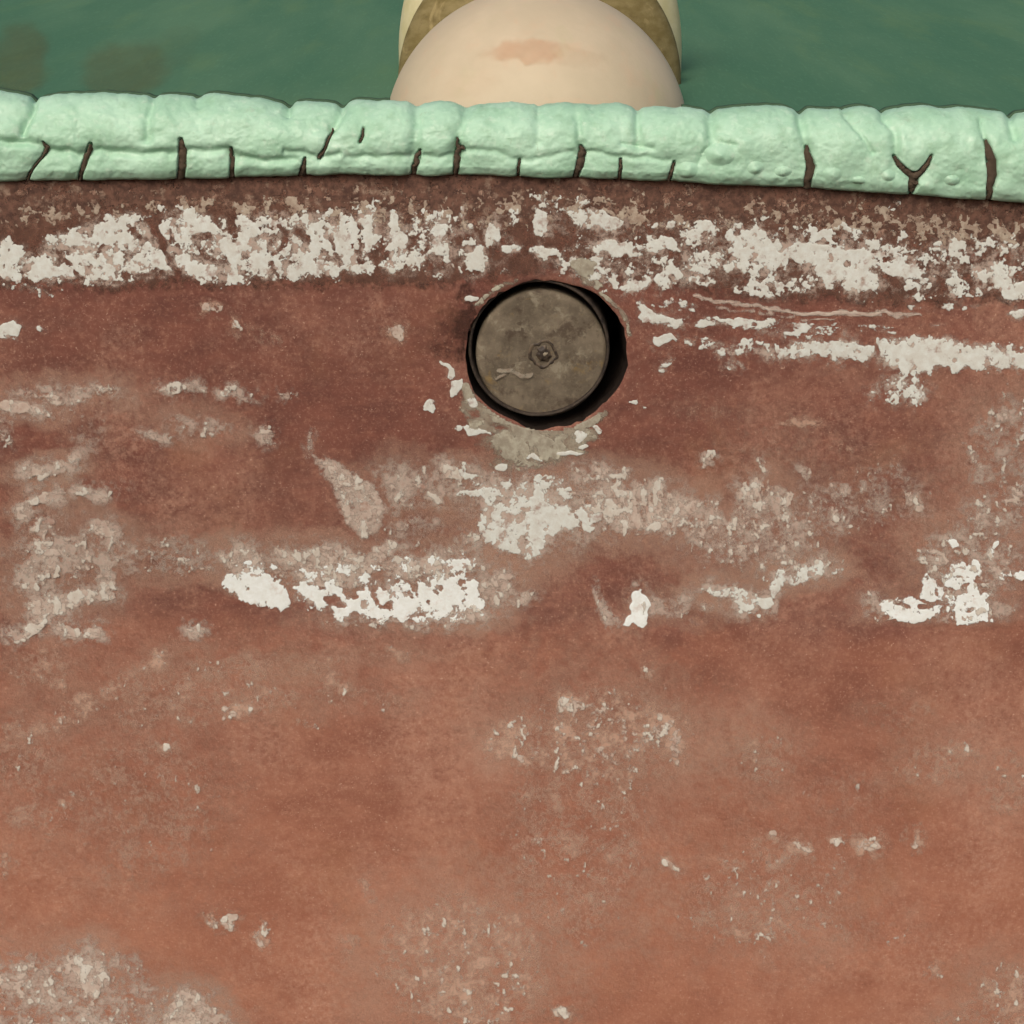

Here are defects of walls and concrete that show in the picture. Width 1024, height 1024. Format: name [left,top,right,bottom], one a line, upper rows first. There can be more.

crack [177,139,187,179]
crack [299,128,334,175]
crack [573,145,587,177]
crack [804,145,815,189]
crack [892,155,932,192]
crack [984,139,997,200]
peeling [0,173,1024,407]
peeling [423,399,436,413]
spalling [439,361,608,471]
peeling [222,553,485,625]
peeling [623,589,651,628]
peeling [879,559,993,626]